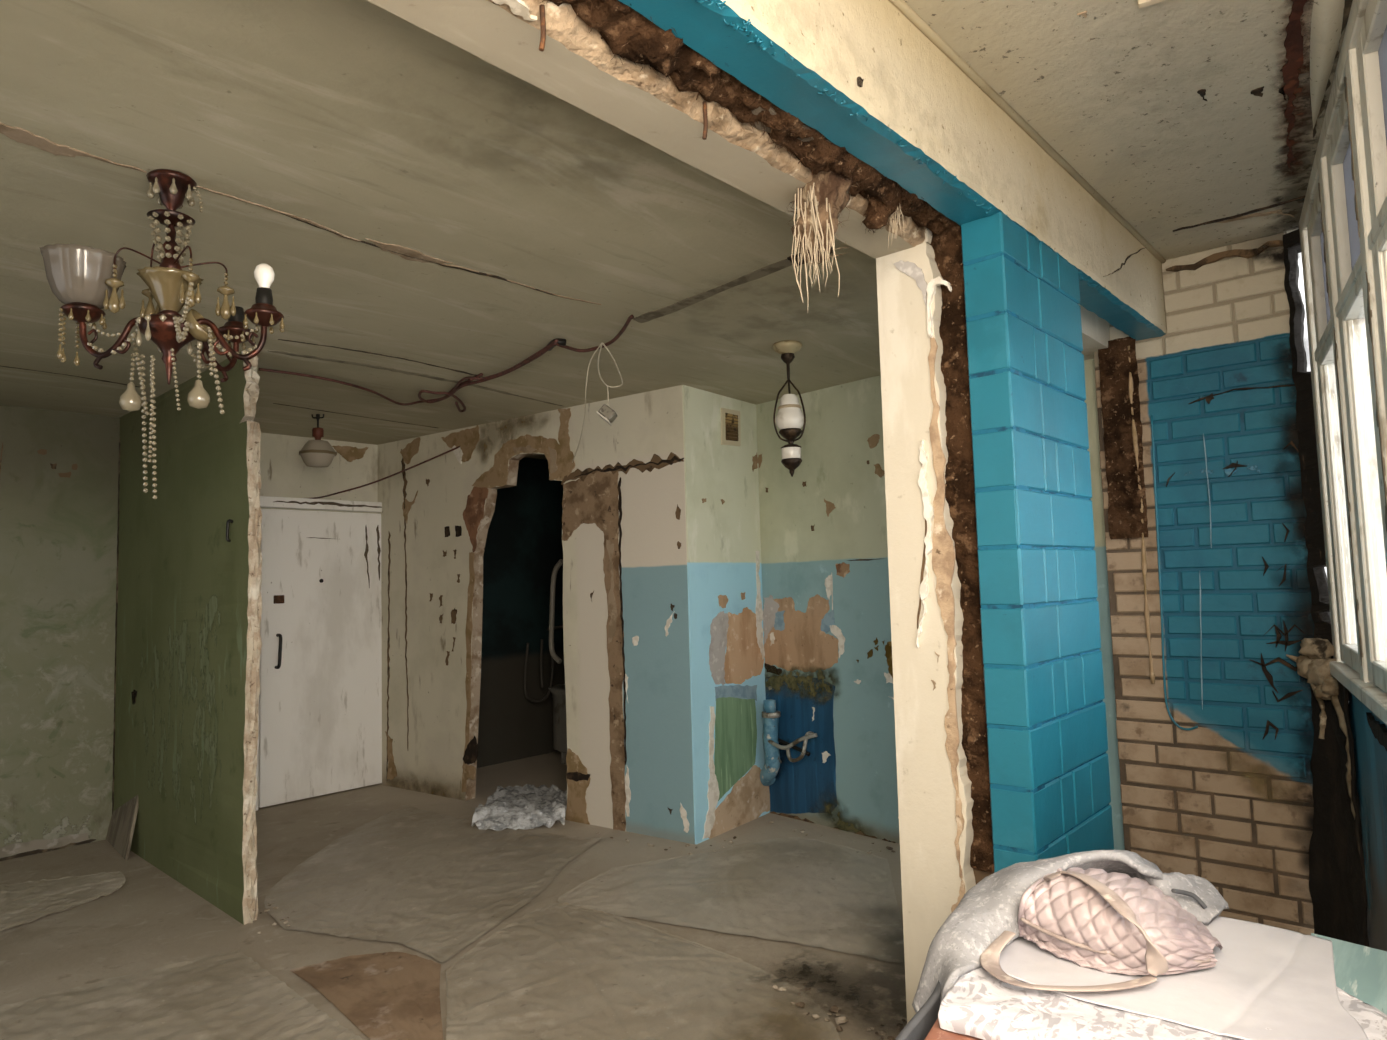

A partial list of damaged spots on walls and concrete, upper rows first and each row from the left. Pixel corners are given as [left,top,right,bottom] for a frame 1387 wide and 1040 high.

peeling [492,0,537,21]
peeling [695,0,800,77]
rust [1278,0,1314,176]
crack [0,123,147,173]
crack [196,186,601,305]
spalling [429,408,575,792]
peeling [590,540,618,643]
peeling [665,604,677,636]
spalling [894,260,966,912]
peeling [668,551,850,839]
spalling [565,748,591,825]